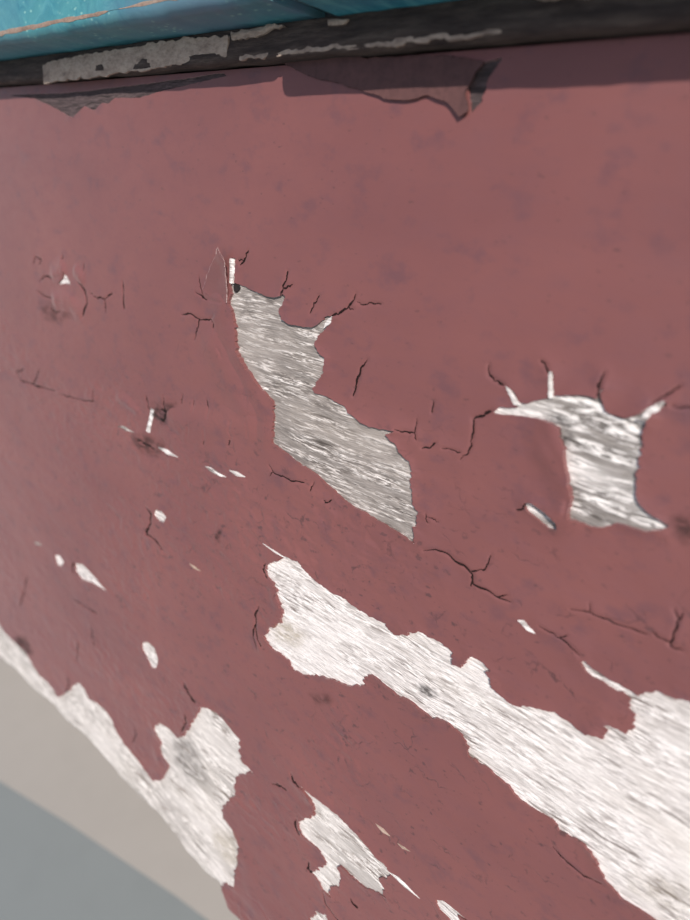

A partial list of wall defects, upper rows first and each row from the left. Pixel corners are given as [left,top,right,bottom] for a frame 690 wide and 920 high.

peeling [12,74,227,117]
peeling [272,55,502,117]
crack [280,271,293,296]
crack [310,294,381,317]
peeling [202,247,418,542]
crack [353,361,367,396]
crack [394,401,492,460]
peeling [494,372,668,546]
crack [423,549,510,602]
crack [570,603,683,651]
peeling [0,626,252,887]
peeling [264,544,690,920]